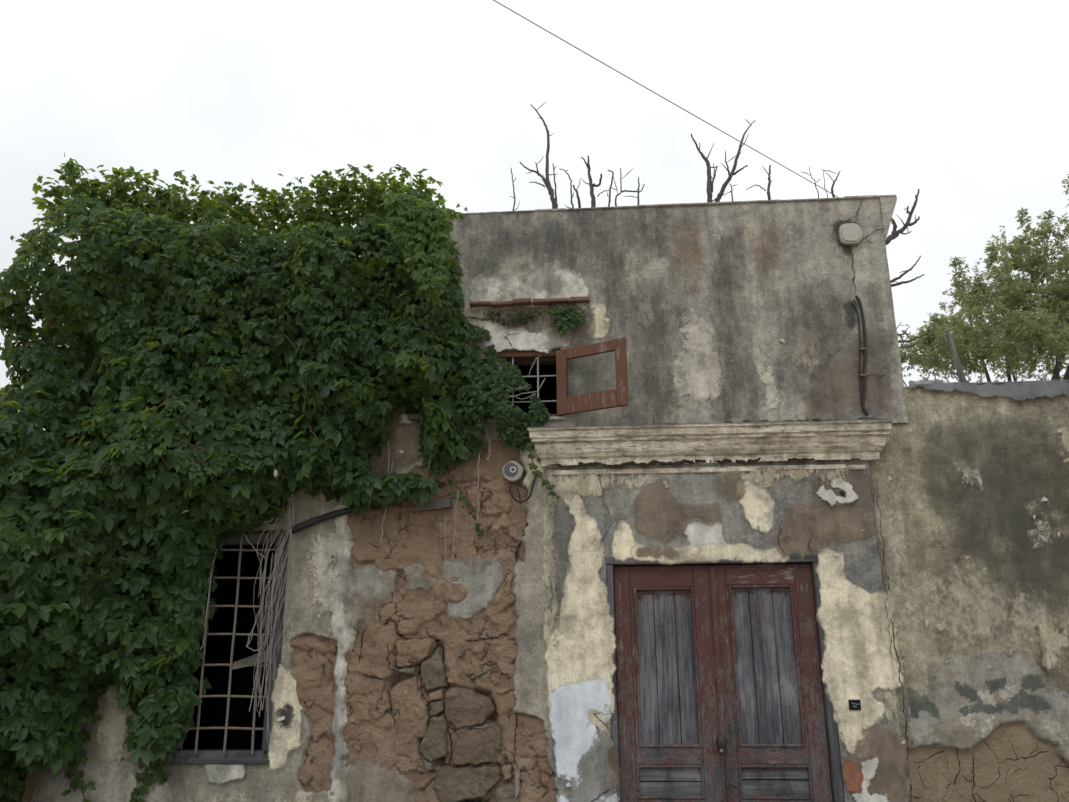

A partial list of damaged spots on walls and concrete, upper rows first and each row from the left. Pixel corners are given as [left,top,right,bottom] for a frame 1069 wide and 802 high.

peeling [469,260,610,353]
damp [833,219,862,256]
crack [839,199,881,295]
damp [926,420,1069,592]
spalling [205,404,1069,802]
crack [545,457,1069,802]